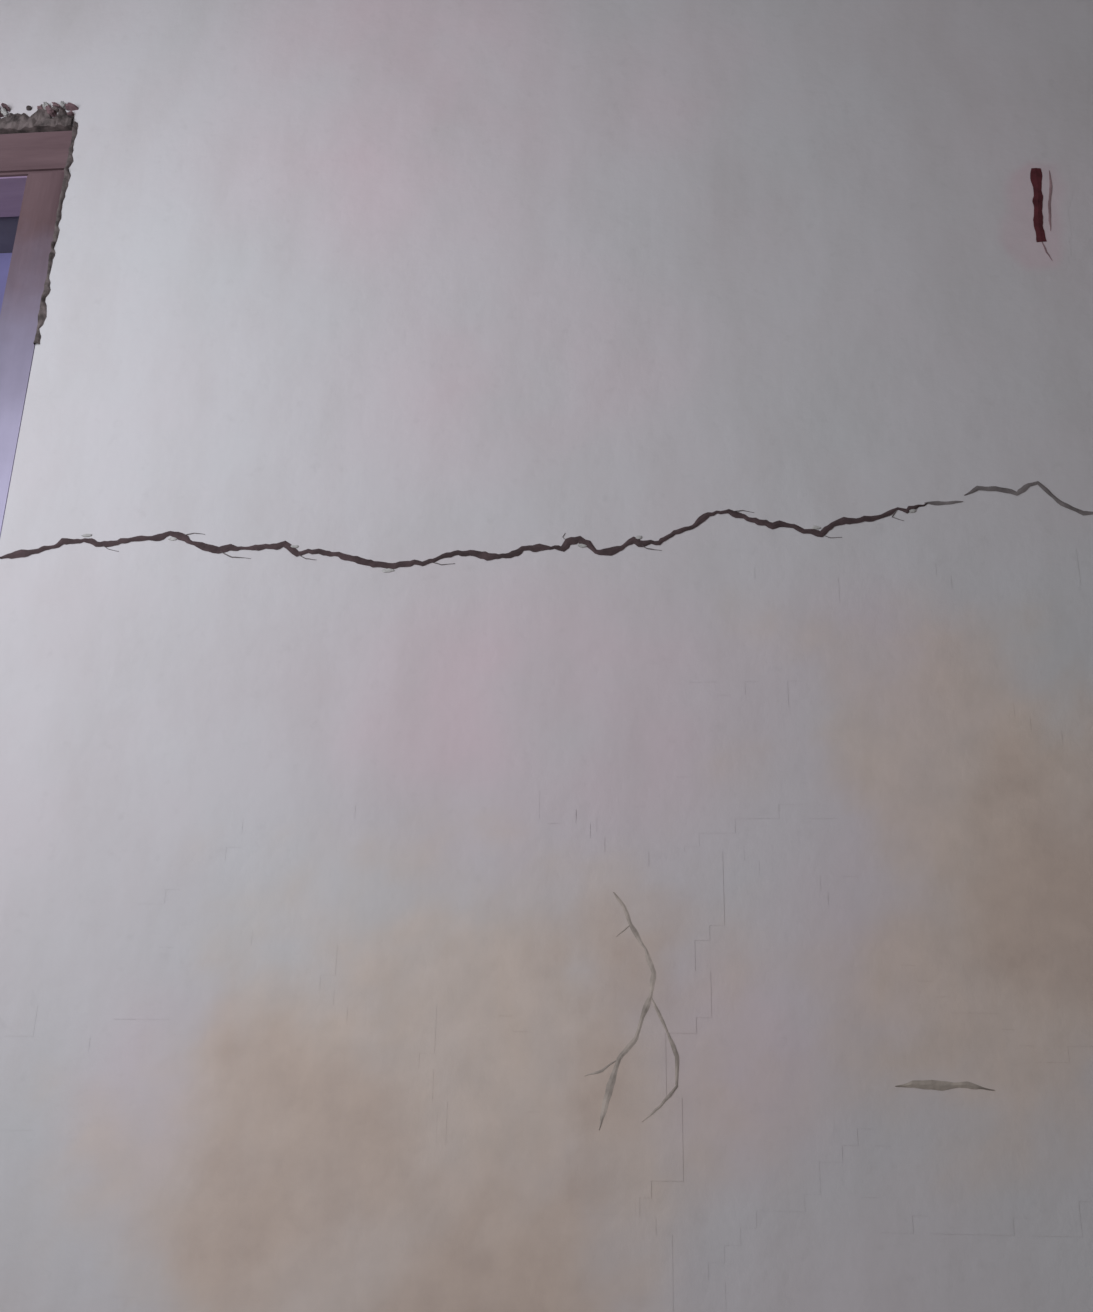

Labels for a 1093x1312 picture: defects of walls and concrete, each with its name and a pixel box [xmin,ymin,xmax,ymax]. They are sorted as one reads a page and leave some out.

flaking render [0,101,79,345]
corrosion [992,155,1075,276]
crack [0,481,1093,572]
water stain [0,547,1093,1312]
crack [585,892,679,1130]